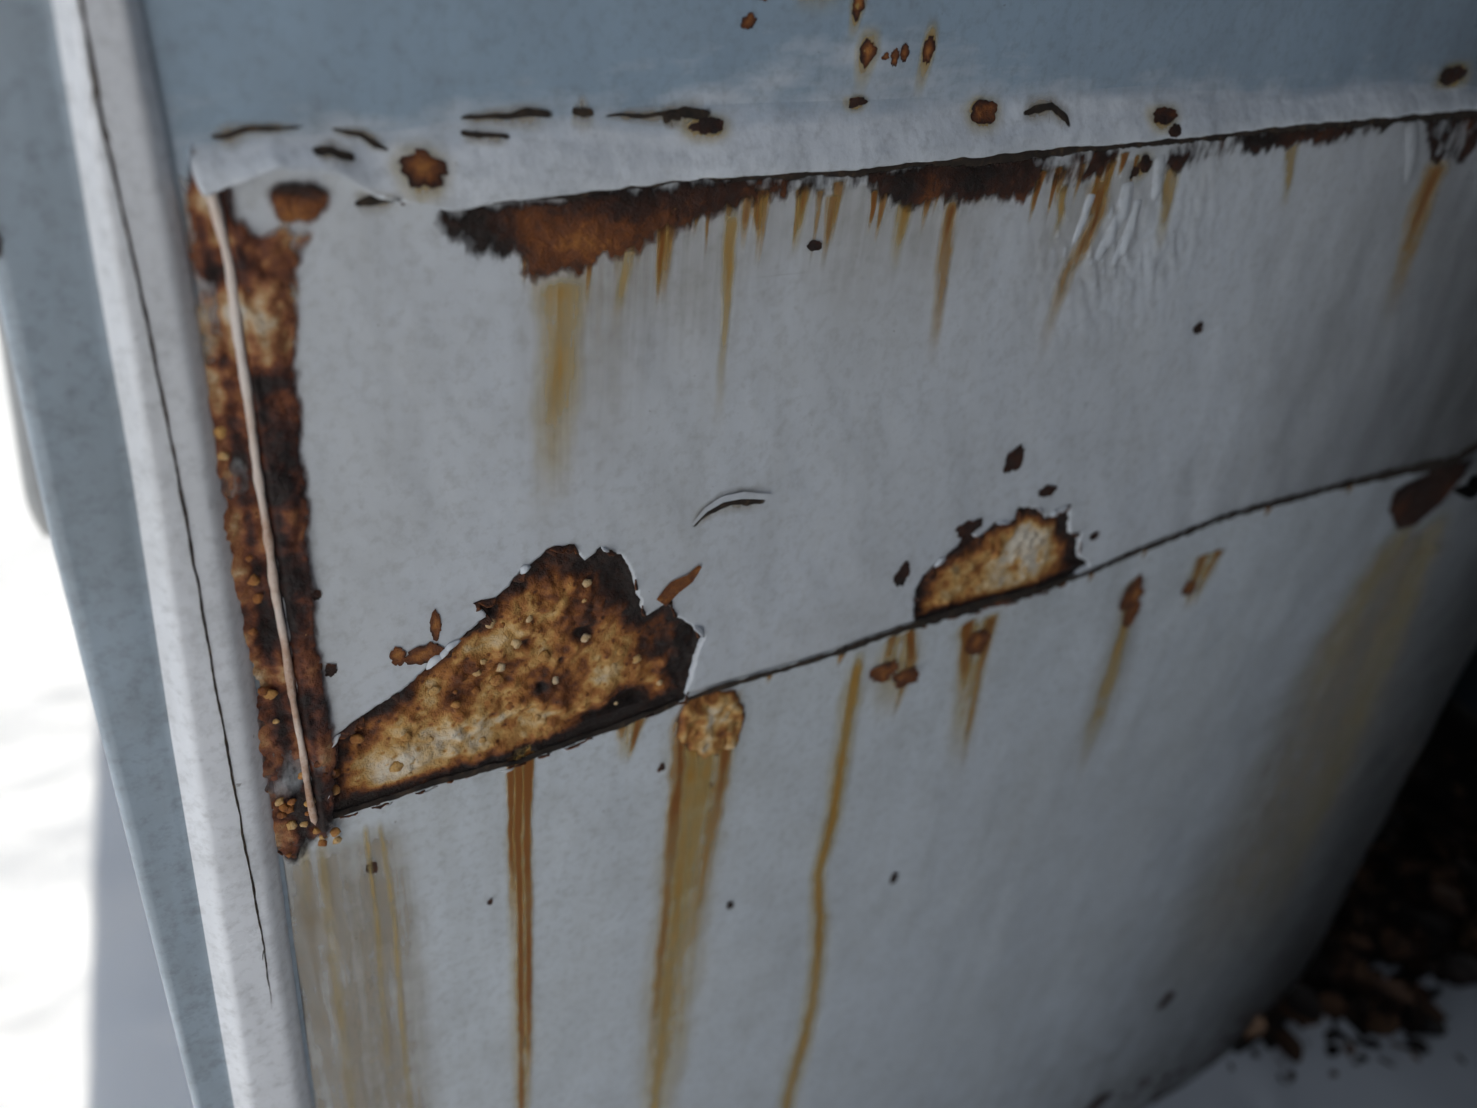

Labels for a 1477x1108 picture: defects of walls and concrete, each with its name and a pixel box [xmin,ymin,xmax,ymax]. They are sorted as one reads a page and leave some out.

corrosion [439,149,1139,425]
corrosion [1162,124,1389,221]
corrosion [1403,117,1477,262]
corrosion [186,153,369,1108]
peeling [365,862,378,874]
peeling [328,544,705,819]
corrosion [507,748,534,1108]
corrosion [618,719,645,752]
corrosion [651,690,745,1108]
peeling [893,485,1100,629]